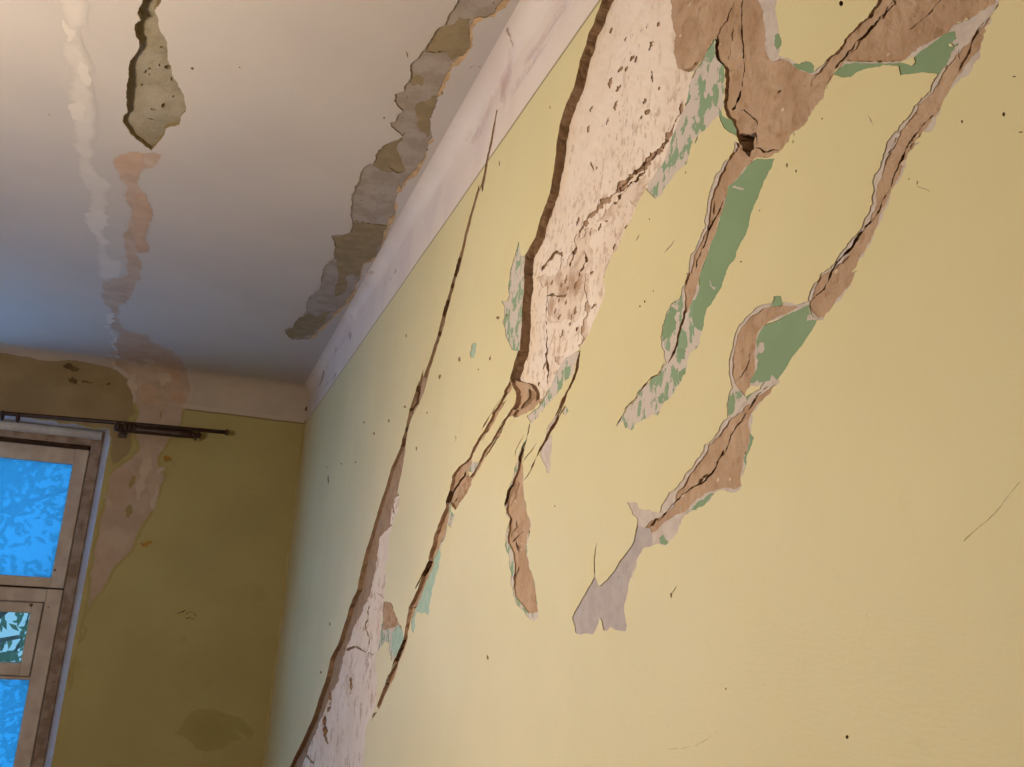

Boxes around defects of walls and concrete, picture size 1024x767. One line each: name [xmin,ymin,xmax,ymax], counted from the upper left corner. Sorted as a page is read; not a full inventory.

damp [0,352,137,465]
peeling [56,0,193,697]
peeling [285,0,510,340]
crack [290,110,580,767]
flaking render [496,0,999,621]